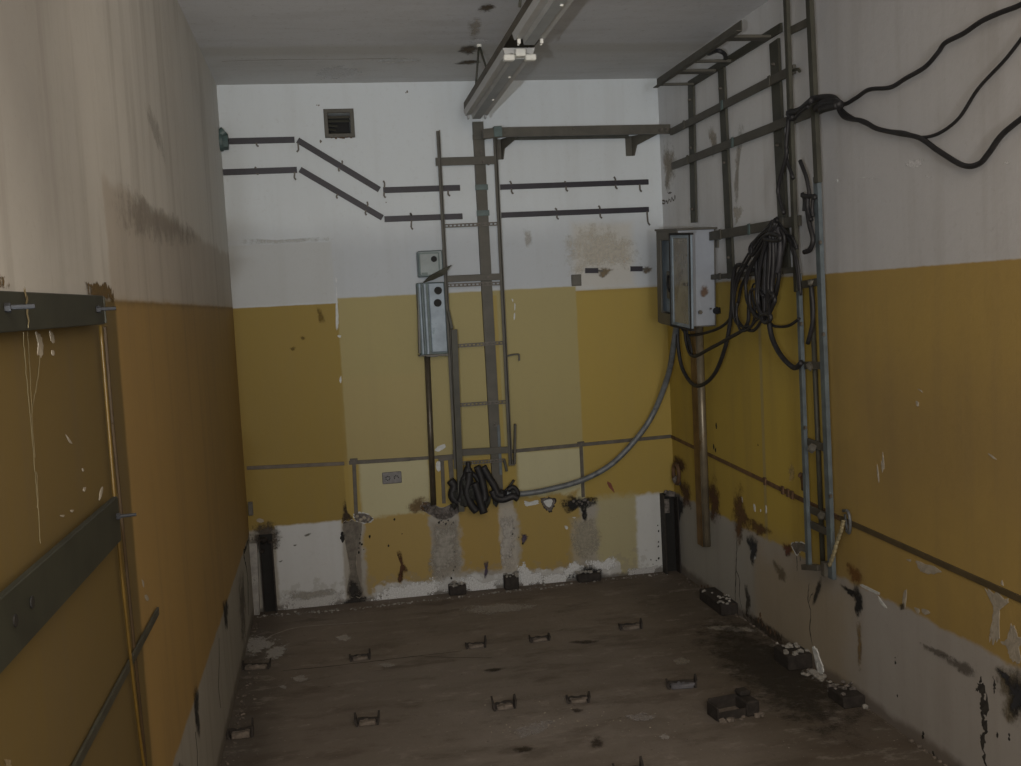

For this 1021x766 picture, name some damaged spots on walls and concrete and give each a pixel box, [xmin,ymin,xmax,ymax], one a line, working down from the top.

corrosion [734,497,769,544]
corrosion [397,553,407,582]
damp [517,556,662,586]
peeling [985,581,1021,664]